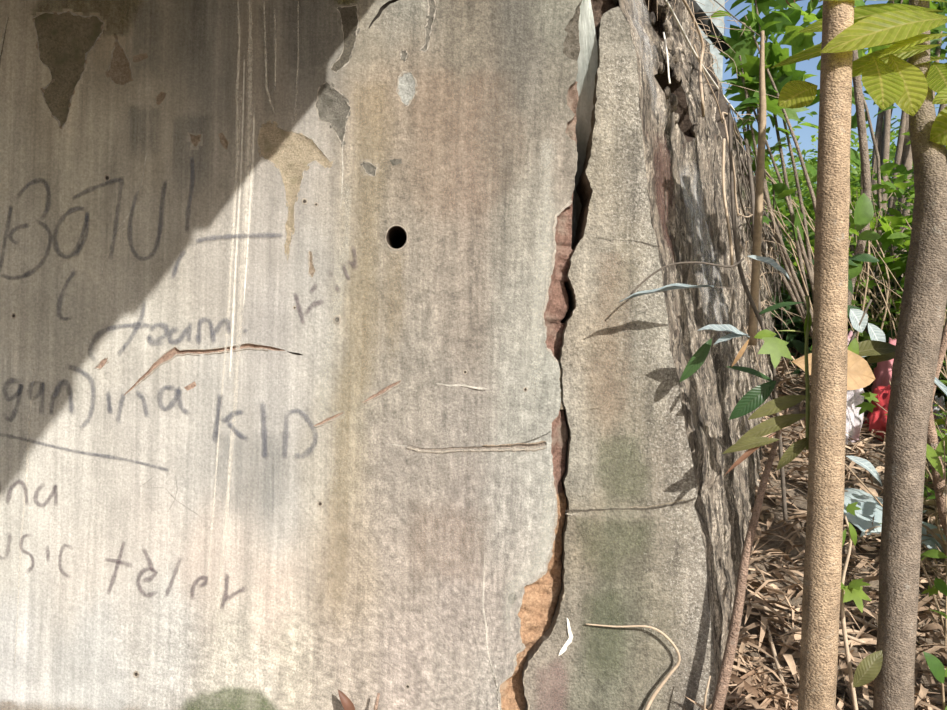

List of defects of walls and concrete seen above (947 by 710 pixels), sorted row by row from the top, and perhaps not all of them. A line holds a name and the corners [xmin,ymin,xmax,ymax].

spalling [32,11,133,130]
spalling [315,5,360,147]
crack [369,0,398,28]
spalling [645,0,700,143]
peeling [257,120,333,261]
crack [123,343,302,396]
crack [388,0,696,710]